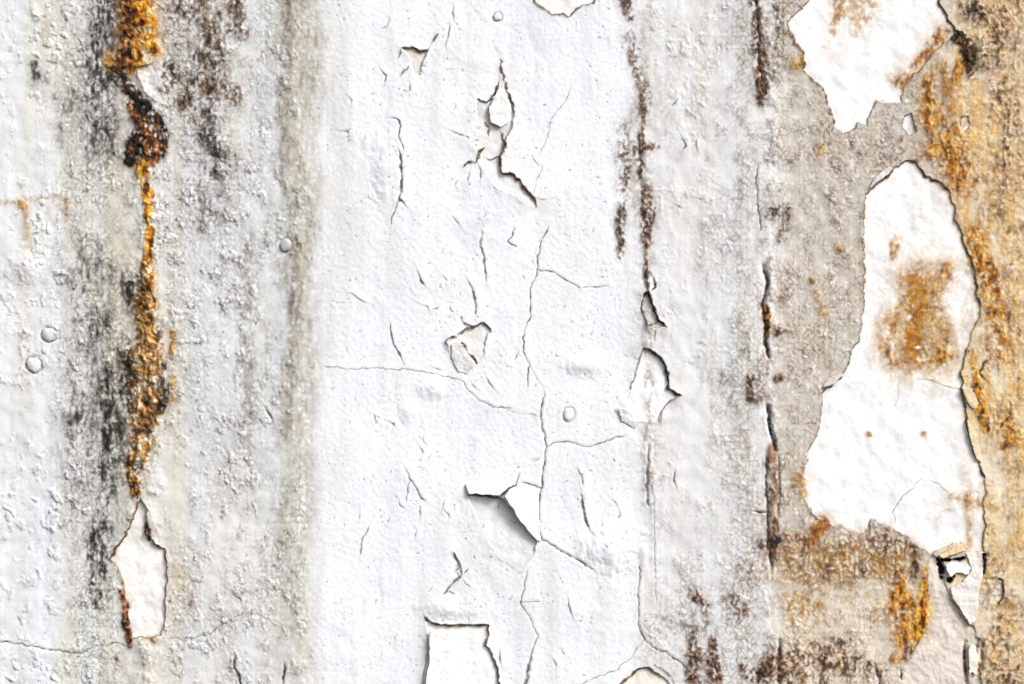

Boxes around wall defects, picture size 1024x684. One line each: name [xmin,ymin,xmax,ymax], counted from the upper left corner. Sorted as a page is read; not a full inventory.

water stain [55,0,122,164]
rust [103,0,177,499]
water stain [158,0,249,231]
crack [391,117,404,222]
peeling [787,0,959,136]
rust [879,0,1024,498]
water stain [63,315,131,609]
flaking render [109,499,168,639]
crack [325,226,623,570]
crack [520,575,539,684]
rust [726,443,931,684]
peeling [802,159,987,684]